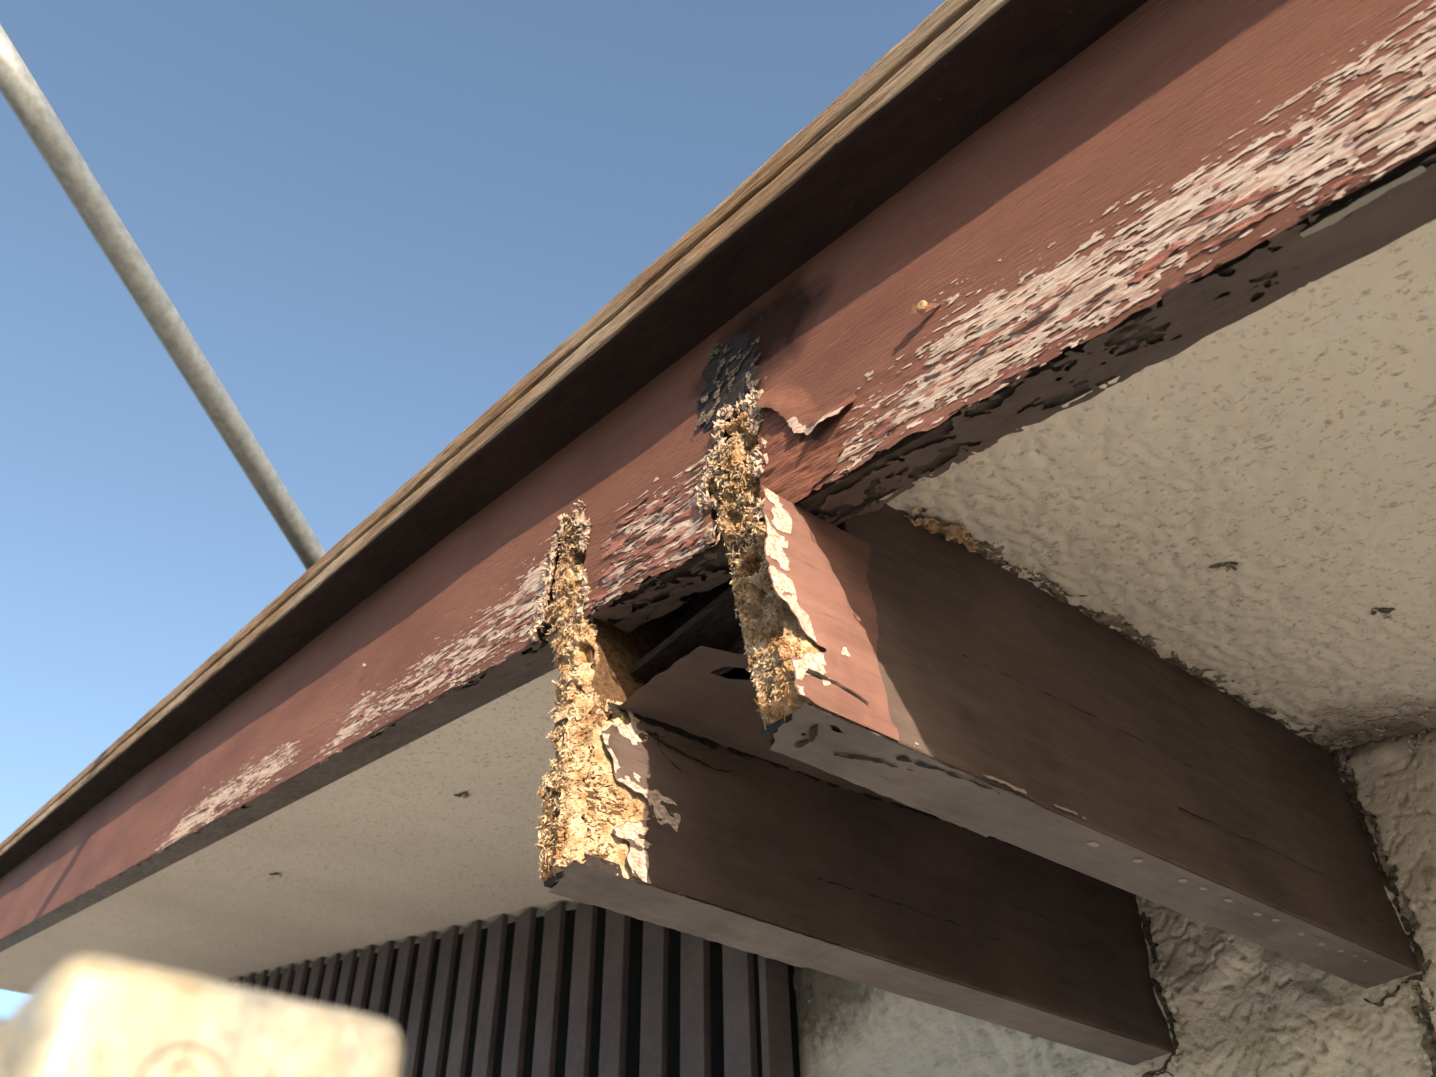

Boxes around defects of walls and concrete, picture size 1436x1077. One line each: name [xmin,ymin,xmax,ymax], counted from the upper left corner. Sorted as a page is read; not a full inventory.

peeling [831,0,1436,482]
peeling [155,533,557,854]
crack [903,507,1436,1077]